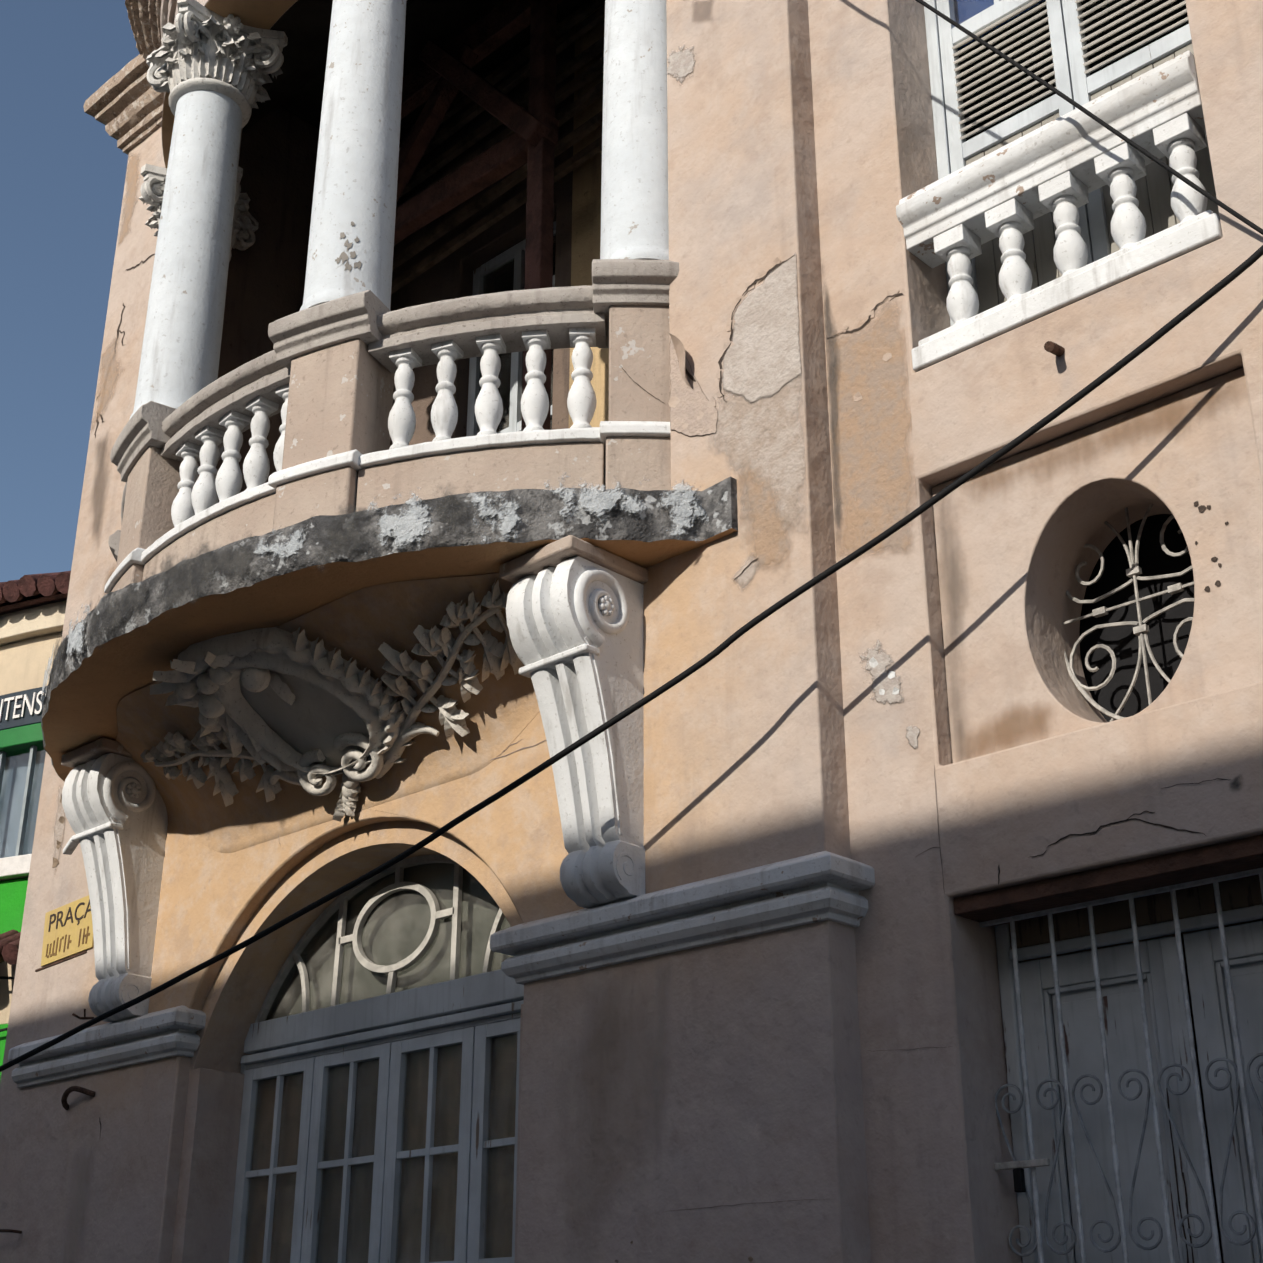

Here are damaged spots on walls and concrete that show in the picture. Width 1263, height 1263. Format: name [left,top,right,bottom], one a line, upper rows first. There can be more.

crack [125,254,155,271]
crack [114,303,125,353]
peeling [668,253,806,531]
leakage [437,493,470,527]
leakage [89,541,254,641]
leakage [52,640,64,682]
peeling [860,640,904,704]
crack [1028,811,1206,858]